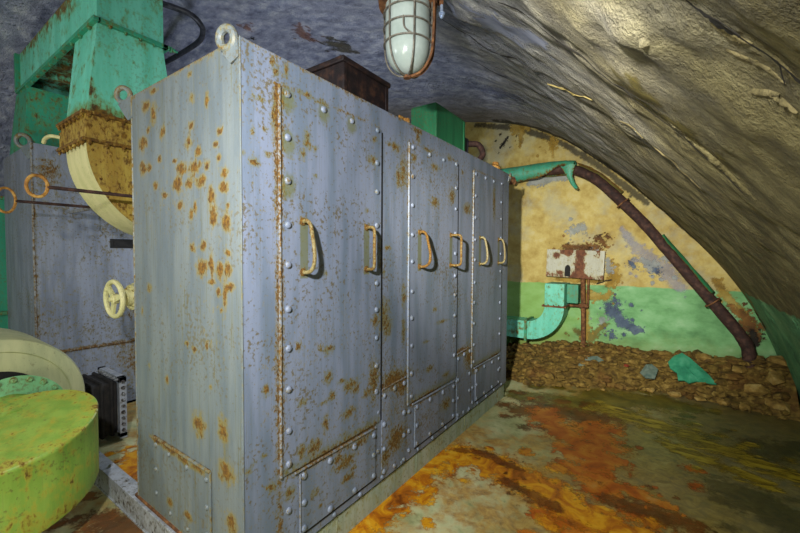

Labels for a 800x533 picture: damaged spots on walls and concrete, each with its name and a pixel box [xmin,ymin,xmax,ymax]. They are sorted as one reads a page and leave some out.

crack [685,0,800,86]
peeling [624,256,677,285]
peeling [590,293,645,340]
corrosion [349,390,718,533]